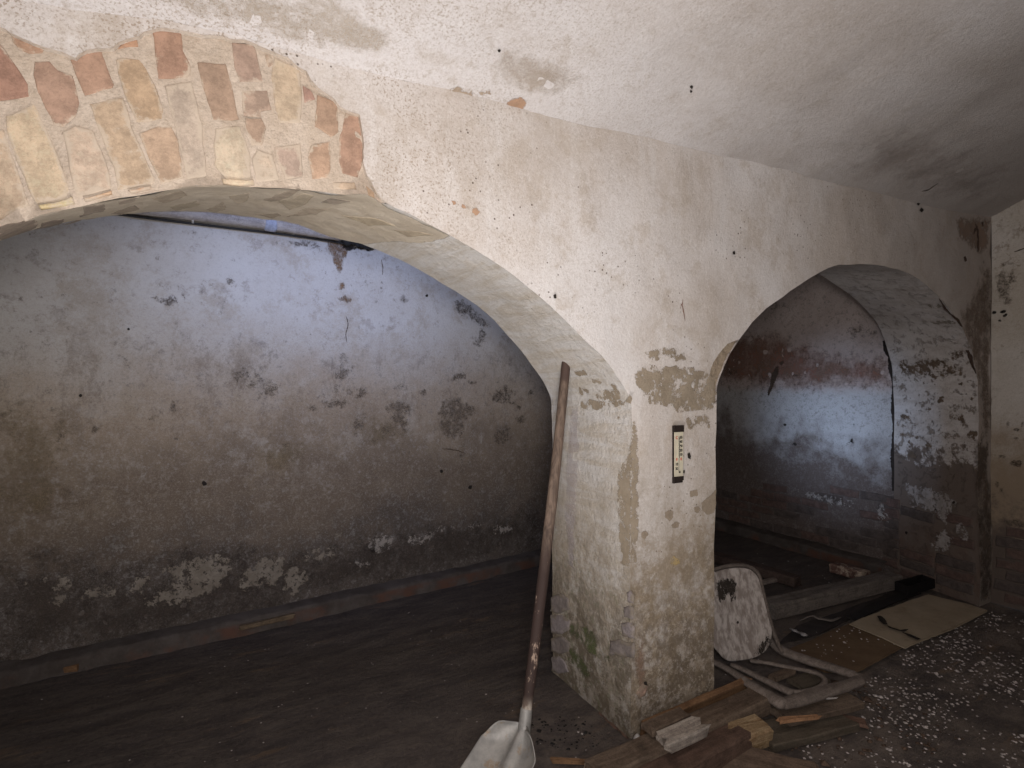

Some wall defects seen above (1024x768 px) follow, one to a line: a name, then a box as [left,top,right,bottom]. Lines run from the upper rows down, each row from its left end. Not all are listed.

spalling [0,27,448,244]
peeling [575,341,736,429]
crack [882,340,894,491]
peeling [899,350,966,385]
leakage [12,510,523,643]
flaking render [550,593,571,674]